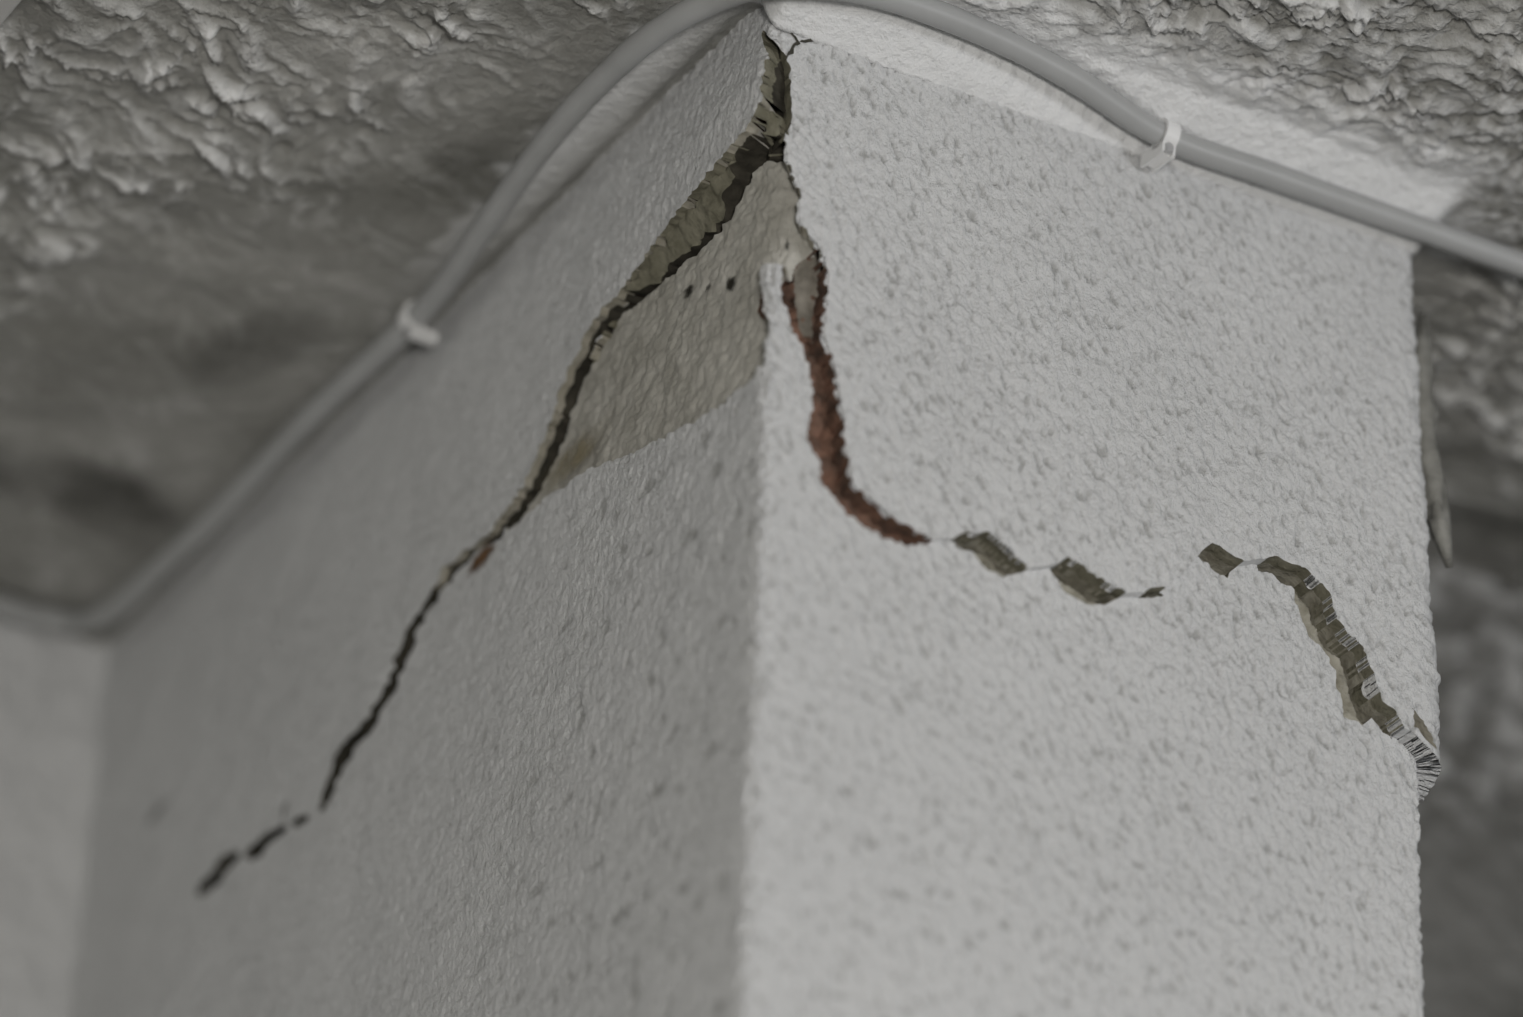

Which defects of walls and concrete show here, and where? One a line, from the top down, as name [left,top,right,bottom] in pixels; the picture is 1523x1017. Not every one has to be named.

crack [197,31,813,896]
flaking render [496,97,826,531]
crack [758,247,1166,605]
crack [1198,543,1403,739]